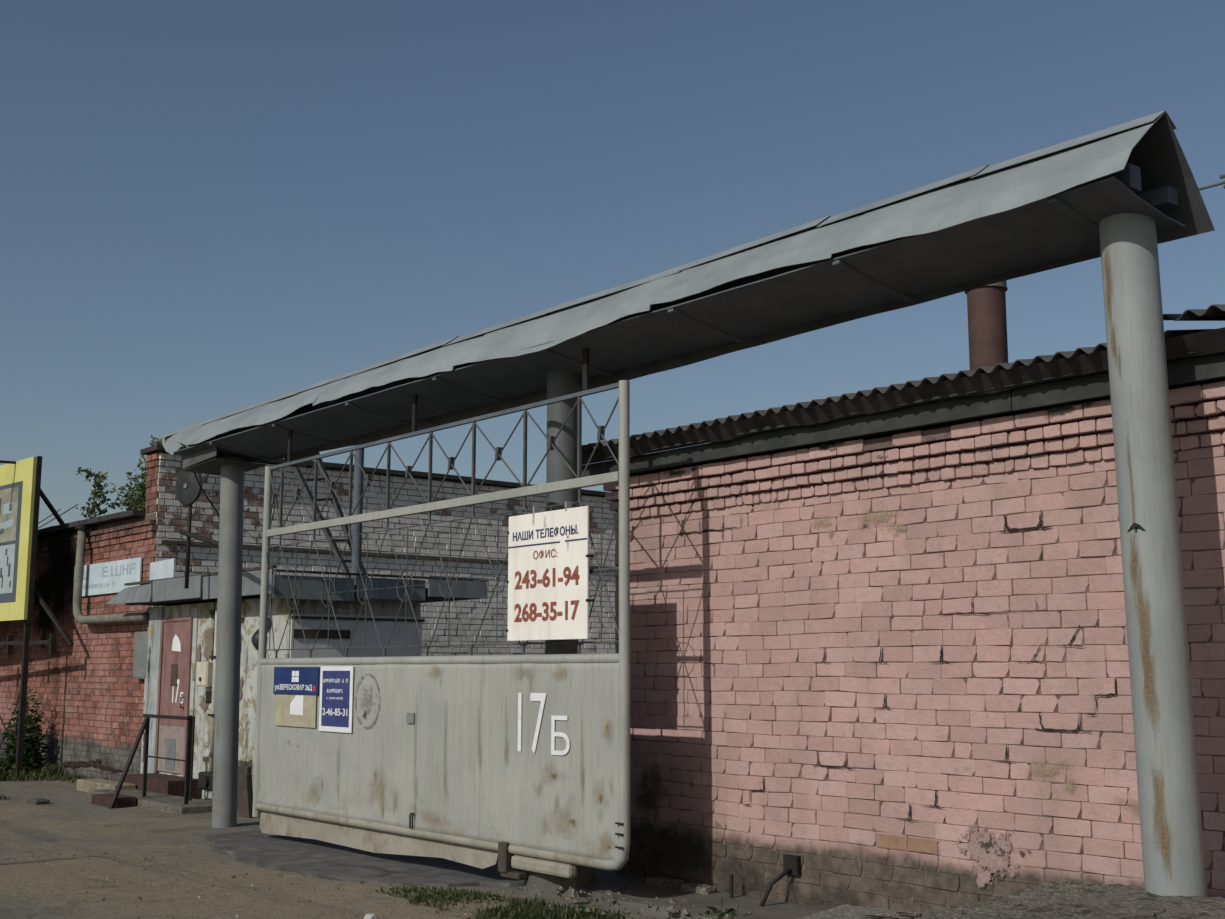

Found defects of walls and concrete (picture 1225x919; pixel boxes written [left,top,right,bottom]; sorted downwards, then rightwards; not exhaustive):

peeling [491,499,533,526]
peeling [589,507,612,533]
rust [1131,546,1156,718]
spalling [953,823,1030,888]